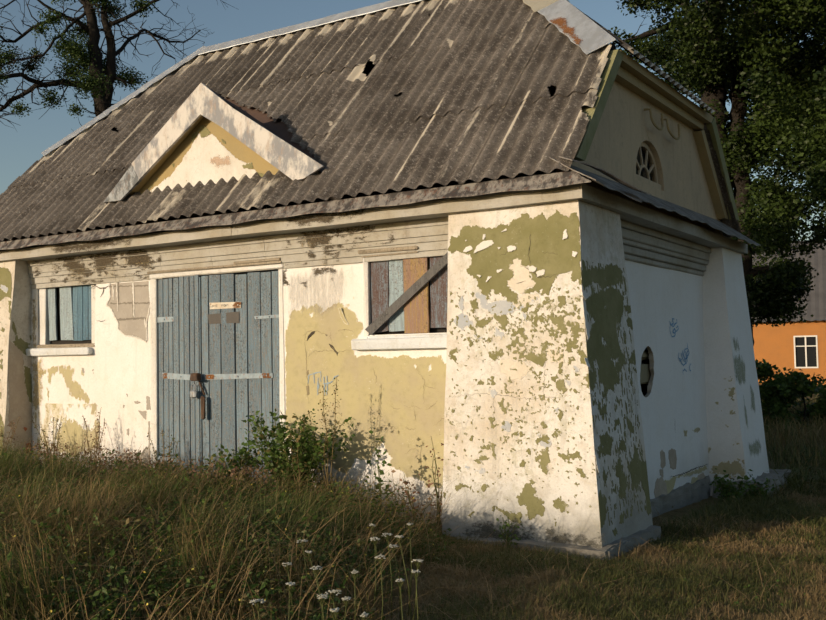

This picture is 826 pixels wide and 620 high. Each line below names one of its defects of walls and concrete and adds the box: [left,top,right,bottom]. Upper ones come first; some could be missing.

rust [550,17,583,44]
peeling [0,267,100,461]
flaking render [123,394,151,420]
peeling [285,209,746,536]